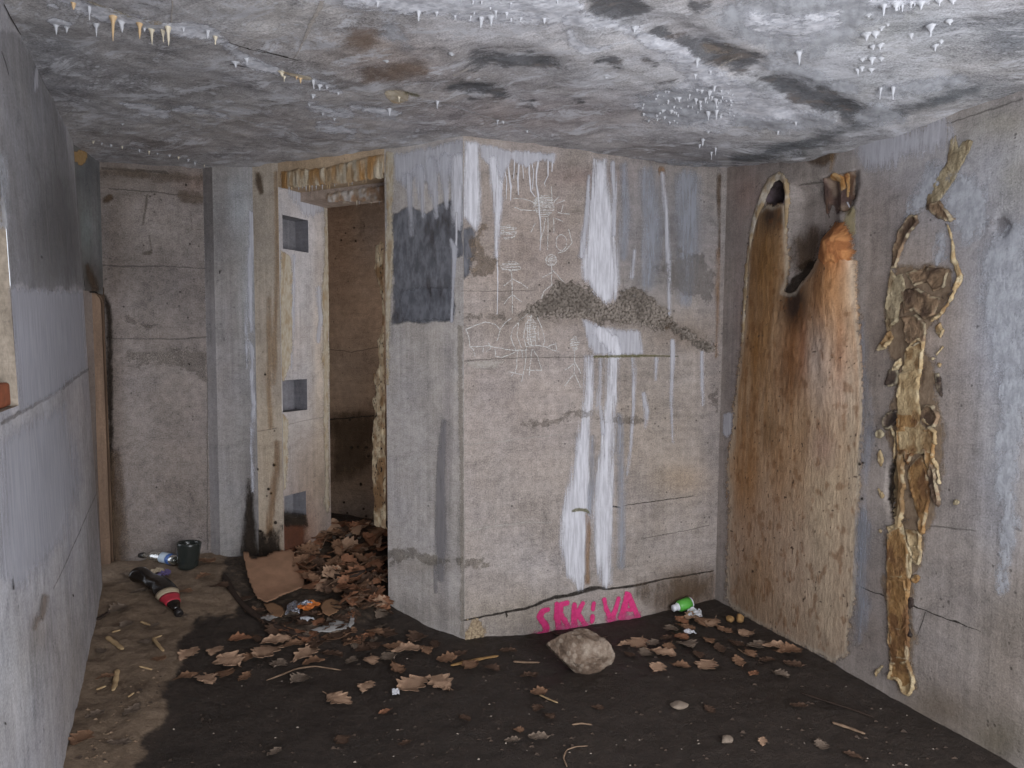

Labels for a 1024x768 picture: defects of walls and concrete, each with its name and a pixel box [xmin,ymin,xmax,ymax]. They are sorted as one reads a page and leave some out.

water stain [47,0,428,139]
water stain [343,0,976,169]
water stain [580,159,636,303]
water stain [660,161,720,316]
spalling [823,171,856,218]
water stain [907,165,988,243]
water stain [280,140,555,529]
water stain [560,321,649,590]
peeling [874,135,973,697]
water stain [979,224,1024,594]
crack [464,570,714,621]
crack [913,606,981,636]